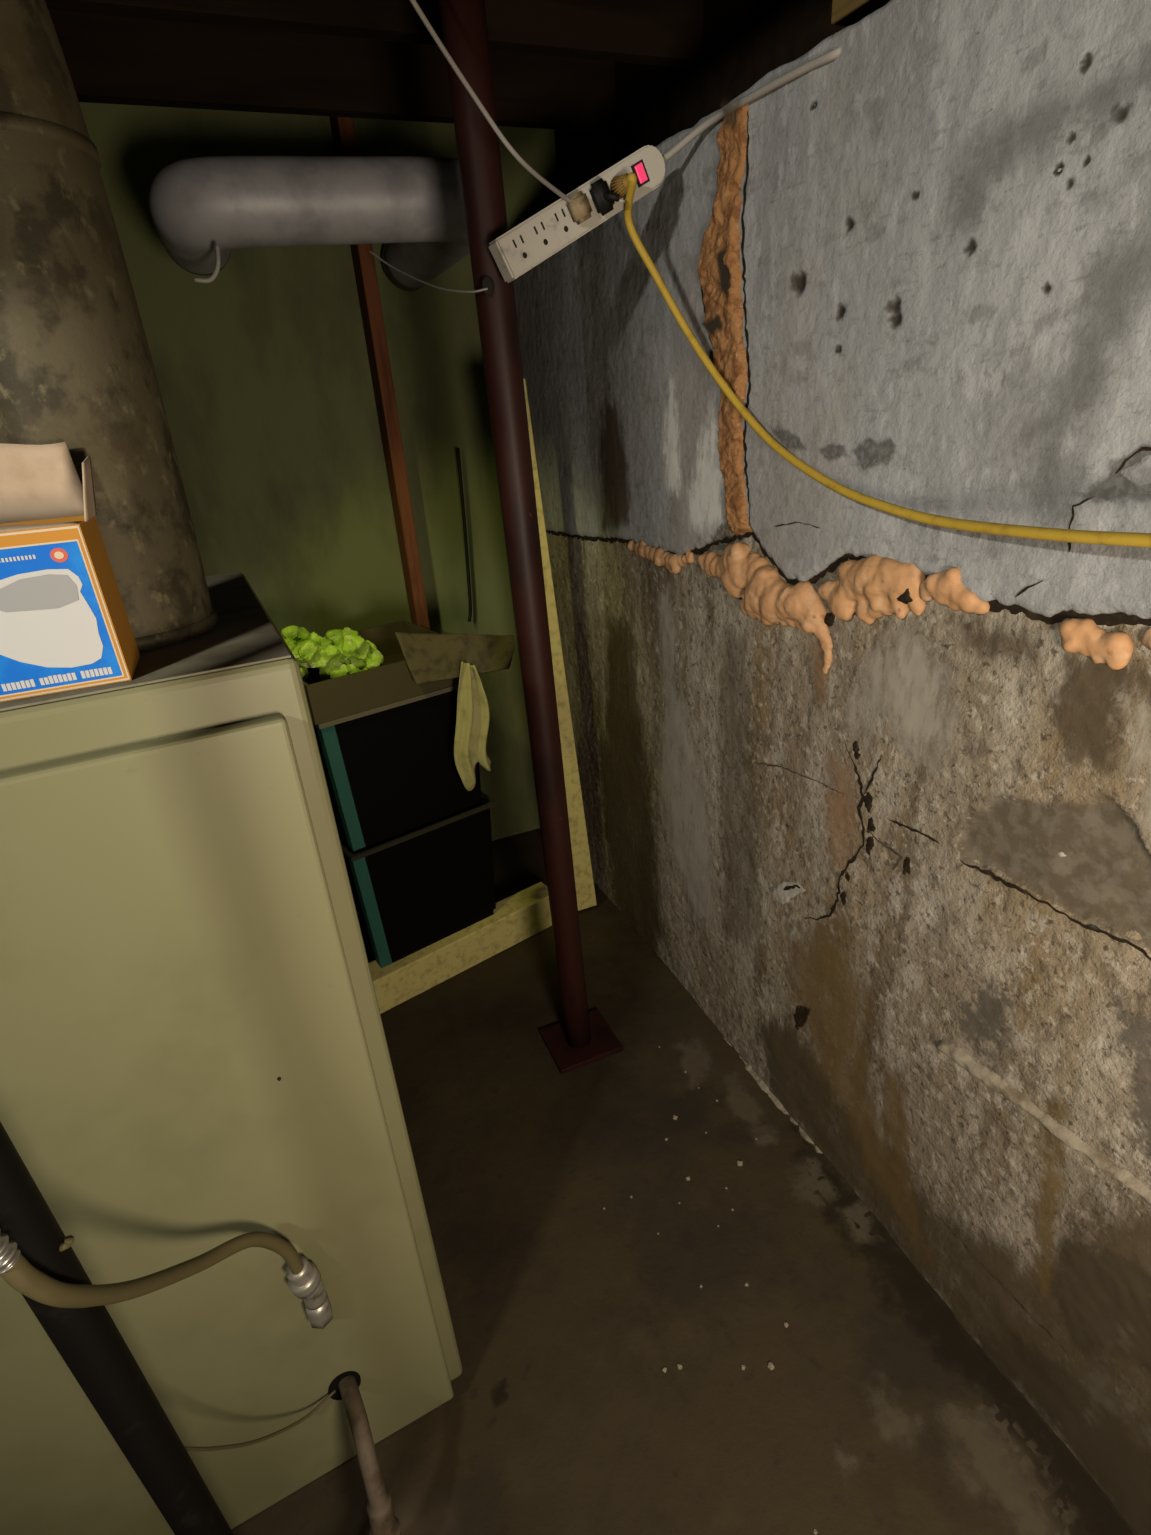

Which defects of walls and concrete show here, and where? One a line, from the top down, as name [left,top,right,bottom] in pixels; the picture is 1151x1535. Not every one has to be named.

crack [546,101,1151,696]
peeling [1084,446,1151,502]
crack [755,740,940,920]
spalling [960,799,1151,961]
leakage [674,1039,778,1145]
leakage [960,983,1013,1069]
leakage [763,1013,1151,1535]